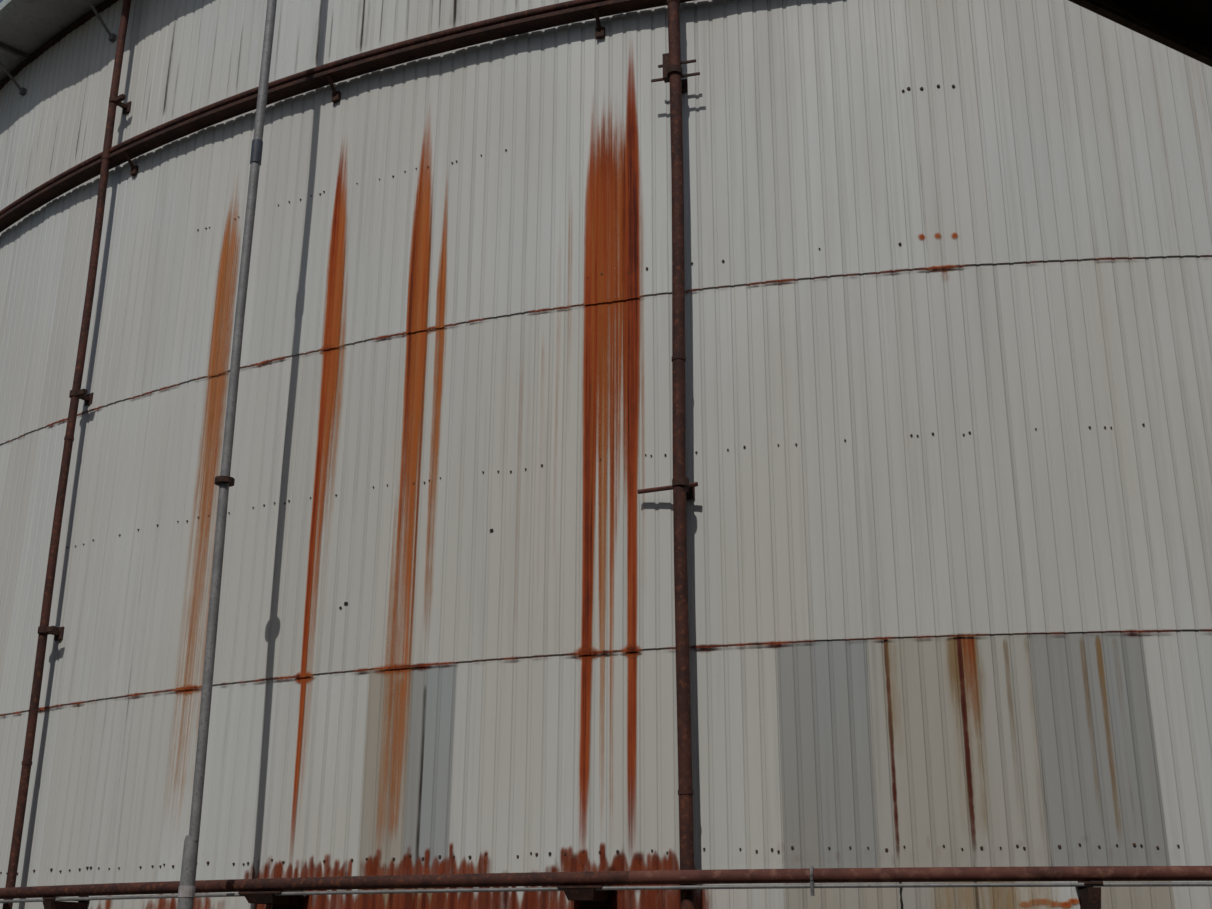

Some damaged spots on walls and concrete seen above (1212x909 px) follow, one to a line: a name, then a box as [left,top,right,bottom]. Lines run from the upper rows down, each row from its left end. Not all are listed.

corrosion [130,212,236,705]
corrosion [258,158,346,831]
corrosion [357,135,452,826]
corrosion [245,701,705,909]
corrosion [570,65,640,834]
corrosion [878,637,899,849]
corrosion [948,634,981,843]